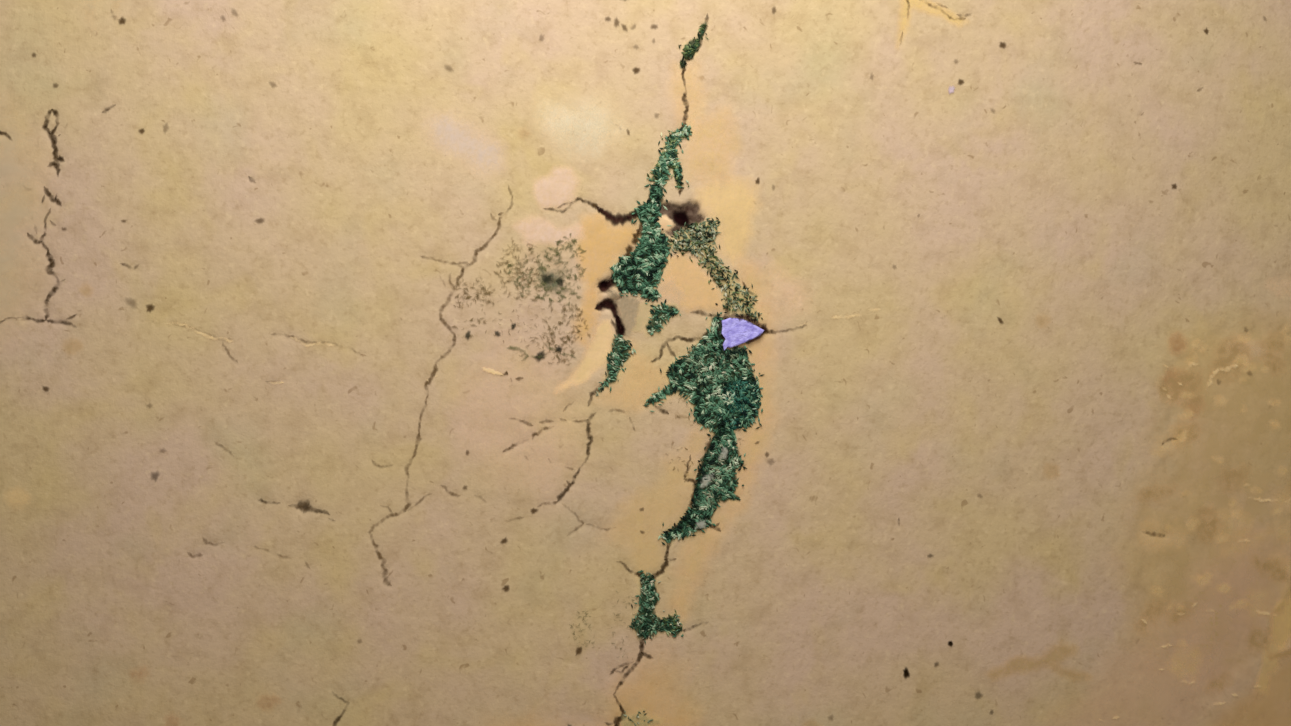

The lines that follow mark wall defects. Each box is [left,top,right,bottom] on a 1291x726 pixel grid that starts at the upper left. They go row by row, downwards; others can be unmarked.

crack [680,17,708,129]
crack [27,109,76,324]
flaking render [658,203,704,235]
crack [391,213,501,516]
mould [495,233,587,360]
peeling [563,280,652,387]
crack [545,178,752,414]
peeling [718,314,767,350]
crack [554,390,598,503]
crack [623,440,740,605]
crack [606,637,651,726]